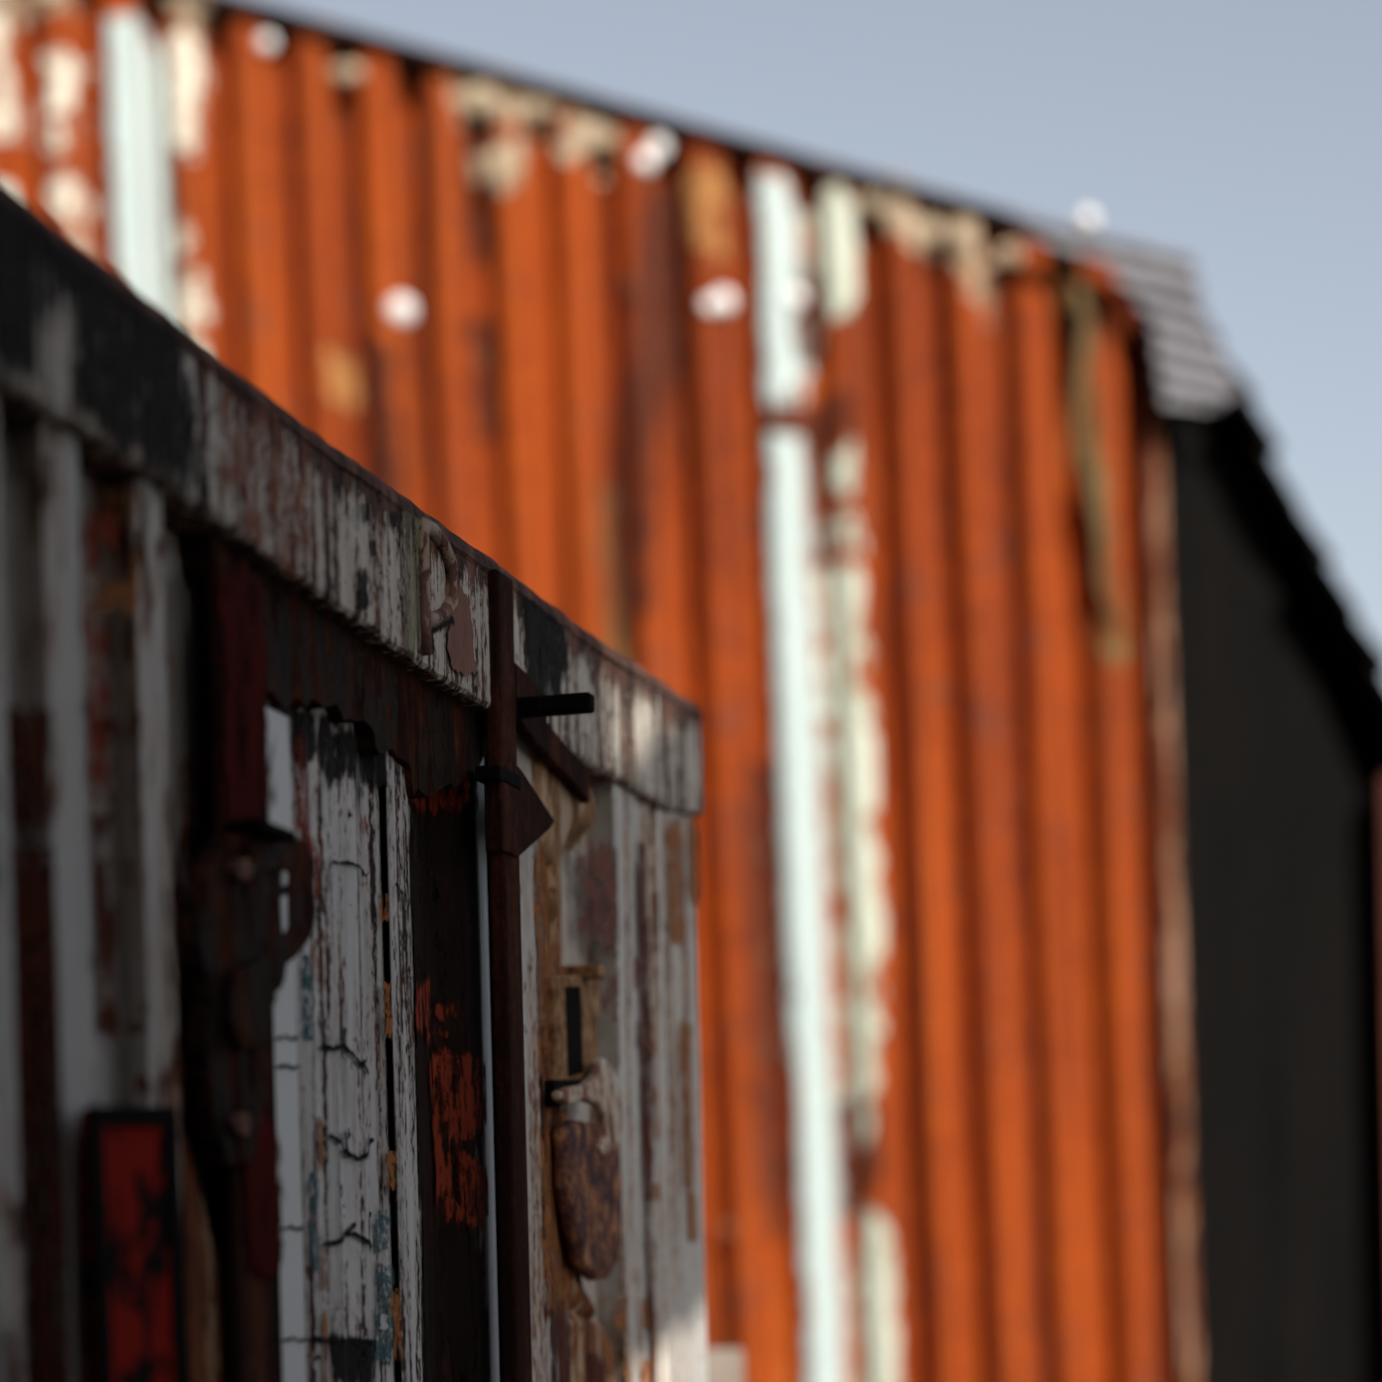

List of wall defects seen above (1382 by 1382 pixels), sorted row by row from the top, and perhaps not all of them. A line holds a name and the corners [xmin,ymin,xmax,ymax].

peeling [358,540,377,611]
peeling [447,583,477,677]
peeling [218,558,387,821]
crack [332,860,407,896]
crack [277,1027,369,1074]
rust [408,772,490,1382]
rust [532,837,660,1382]
crack [329,1131,374,1162]
peeling [245,1104,285,1283]
crack [282,1222,371,1248]
crack [284,1336,376,1347]